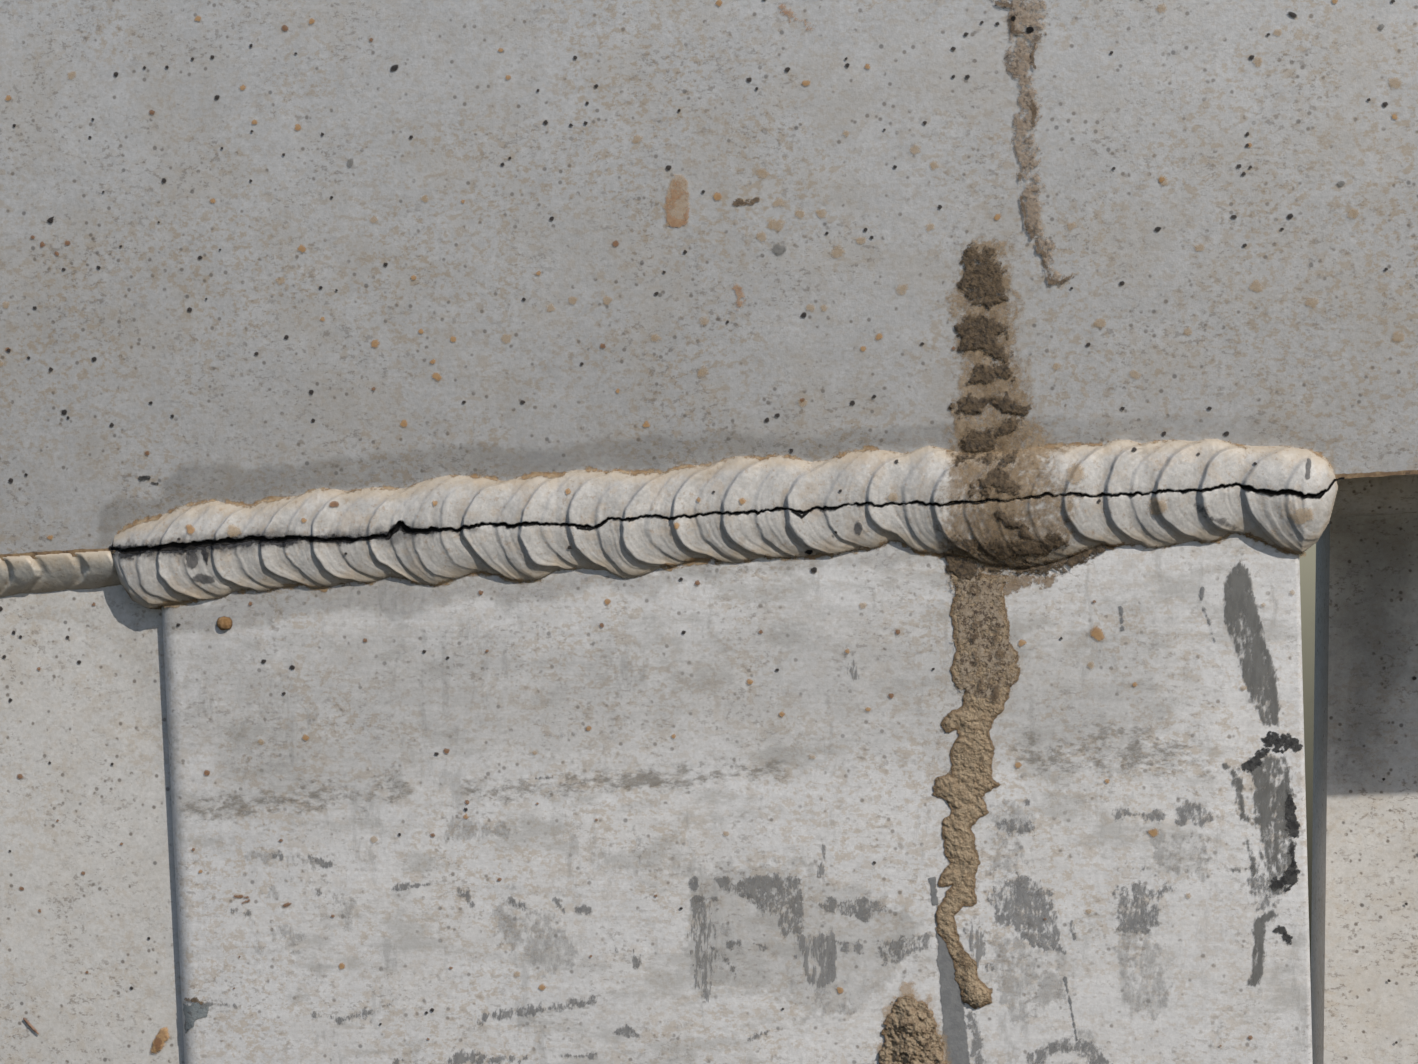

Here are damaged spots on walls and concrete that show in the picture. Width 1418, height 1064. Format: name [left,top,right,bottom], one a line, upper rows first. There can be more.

crack [109,477,1345,565]